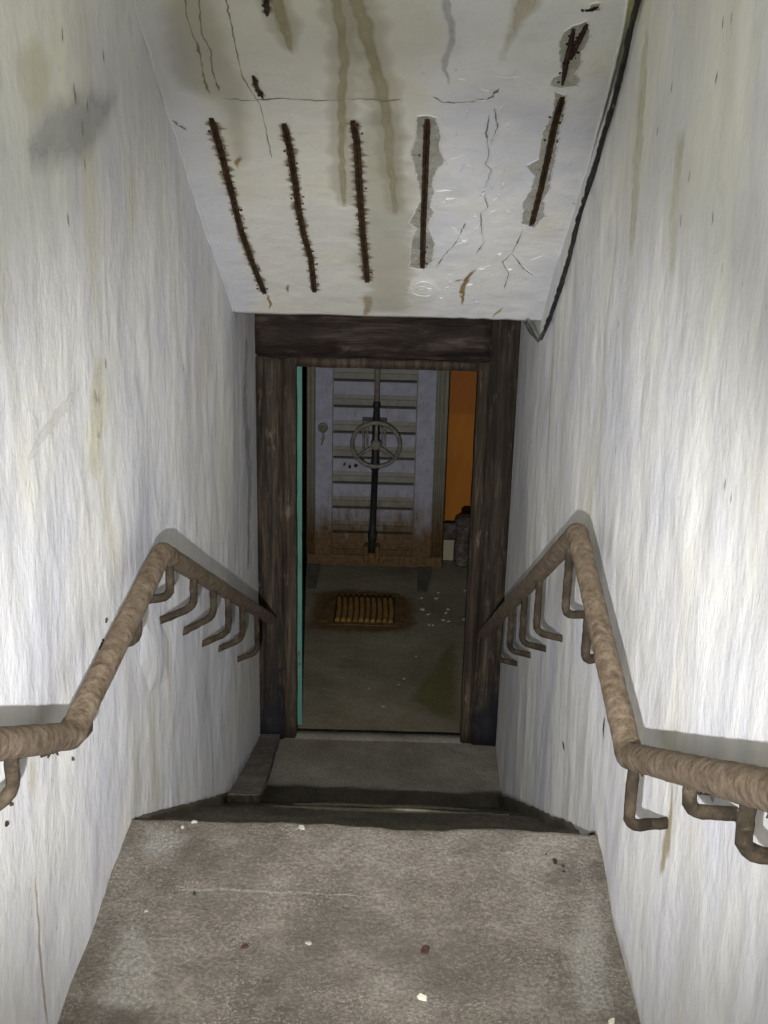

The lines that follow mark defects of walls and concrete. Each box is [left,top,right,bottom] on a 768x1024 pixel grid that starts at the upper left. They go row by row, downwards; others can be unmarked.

leakage [271,0,291,49]
crack [185,0,401,158]
leakage [332,0,397,212]
spalling [408,115,475,271]
crack [434,89,536,289]
spalling [473,0,602,229]
corrosion [662,806,672,866]